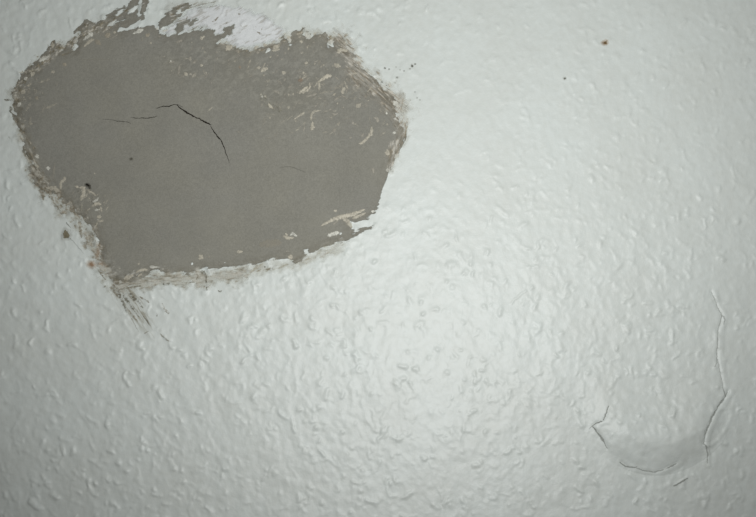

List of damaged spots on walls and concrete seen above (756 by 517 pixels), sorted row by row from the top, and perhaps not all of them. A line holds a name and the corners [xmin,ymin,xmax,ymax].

crack [158,104,229,161]
flaking render [4,0,408,324]